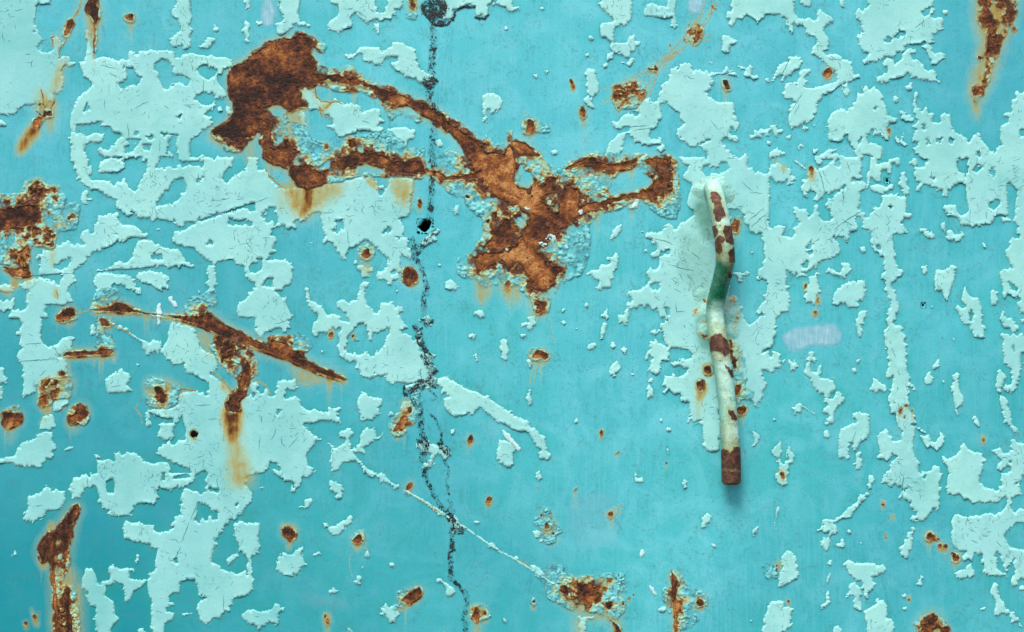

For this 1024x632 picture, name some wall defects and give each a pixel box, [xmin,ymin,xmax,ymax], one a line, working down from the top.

corrosion [971,0,1018,108]
corrosion [211,31,682,317]
corrosion [0,178,80,288]
peeling [0,0,551,632]
peeling [583,0,1024,632]
corrosion [1,405,24,431]
corrosion [37,288,347,484]
corrosion [24,503,81,632]
corrosion [521,561,634,632]
peeling [577,616,595,632]
corrosion [662,570,709,632]
corrosion [914,613,951,632]